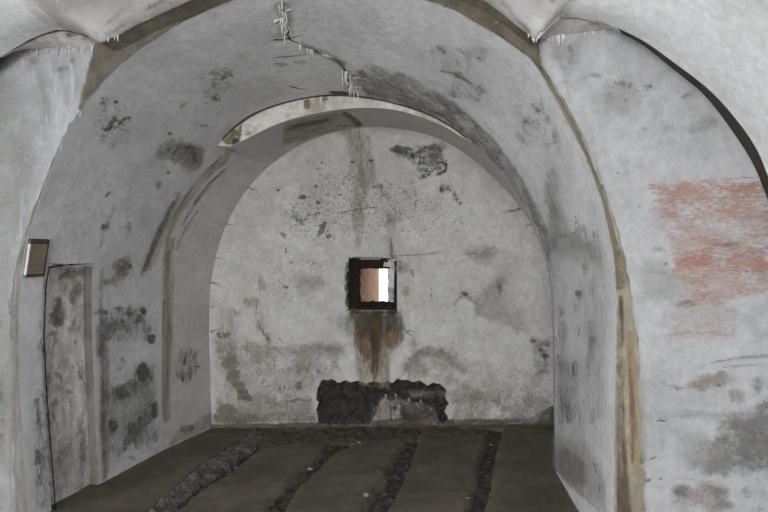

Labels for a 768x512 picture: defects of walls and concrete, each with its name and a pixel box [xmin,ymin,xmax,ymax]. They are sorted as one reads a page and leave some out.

crack [274,3,349,88]
damp [285,62,517,176]
damp [287,144,463,242]
mould [96,306,159,479]
corrosion [350,309,402,378]
damp [211,340,584,429]